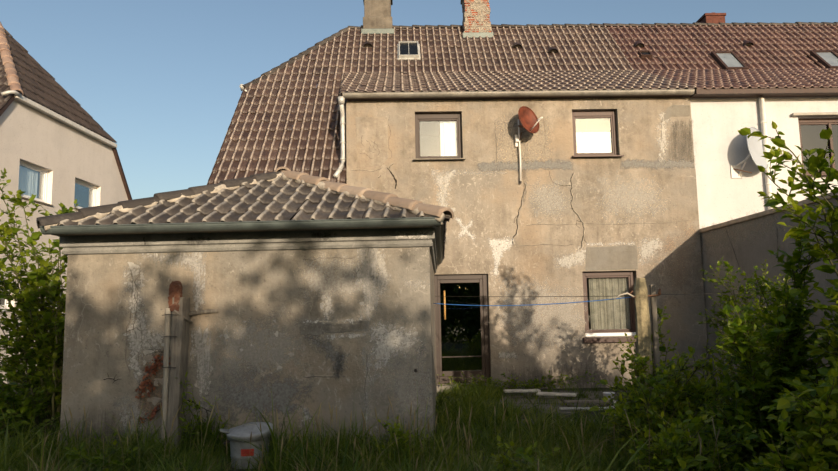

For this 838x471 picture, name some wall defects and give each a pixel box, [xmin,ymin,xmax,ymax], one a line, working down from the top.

crack [512,183,527,244]
crack [549,172,585,250]
peeling [488,237,514,276]
peeling [123,261,170,414]
peeling [320,295,334,320]
peeling [365,319,426,382]